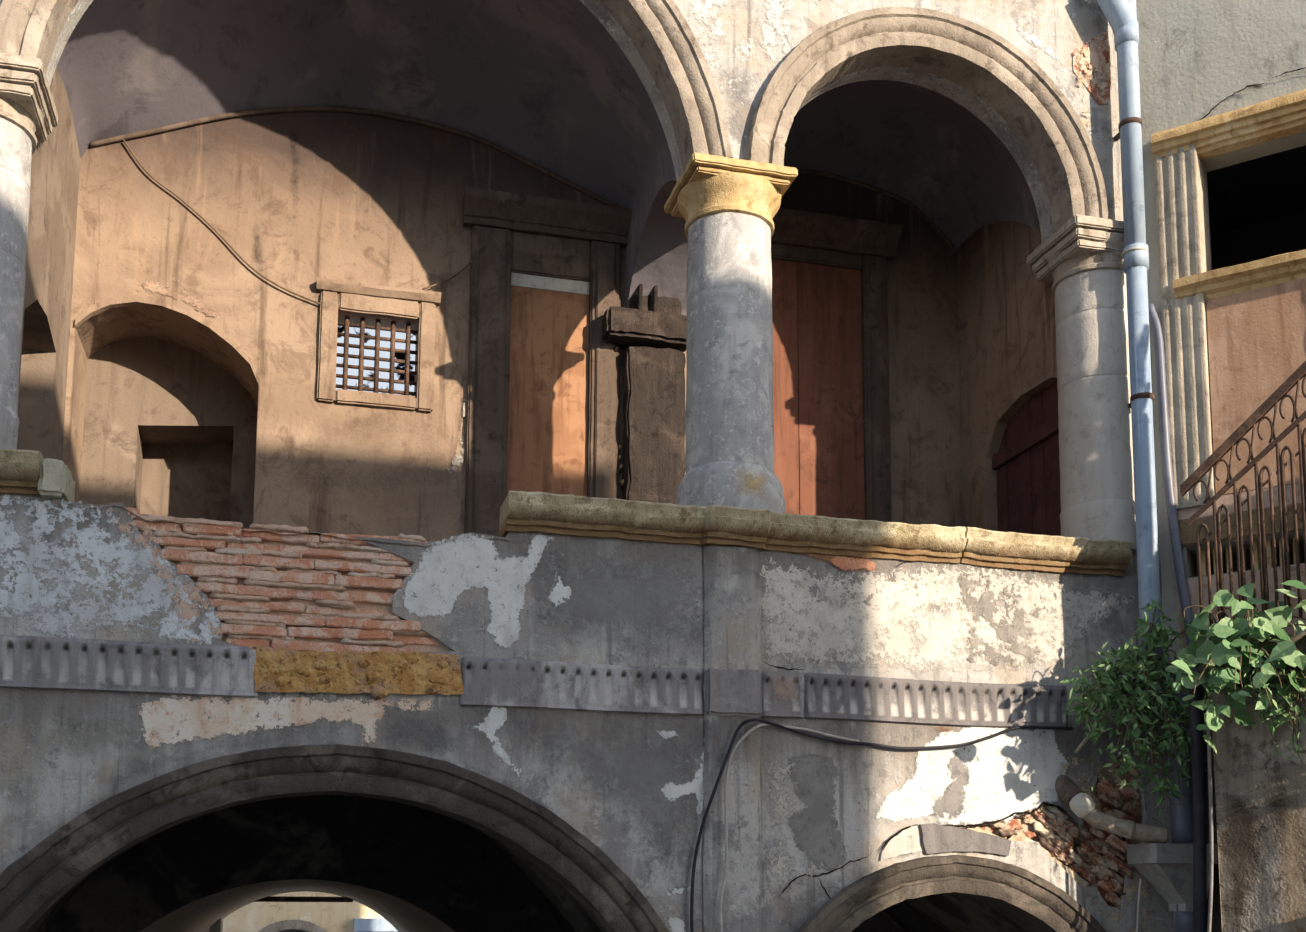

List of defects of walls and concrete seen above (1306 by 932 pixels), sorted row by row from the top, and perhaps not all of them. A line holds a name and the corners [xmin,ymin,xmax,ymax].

spalling [1010,20,1112,129]
crack [1198,67,1306,121]
spalling [447,403,466,474]
flaking render [0,493,571,653]
peeling [138,695,434,749]
peeling [467,707,523,777]
crack [778,801,1068,899]
peeling [871,727,1141,908]